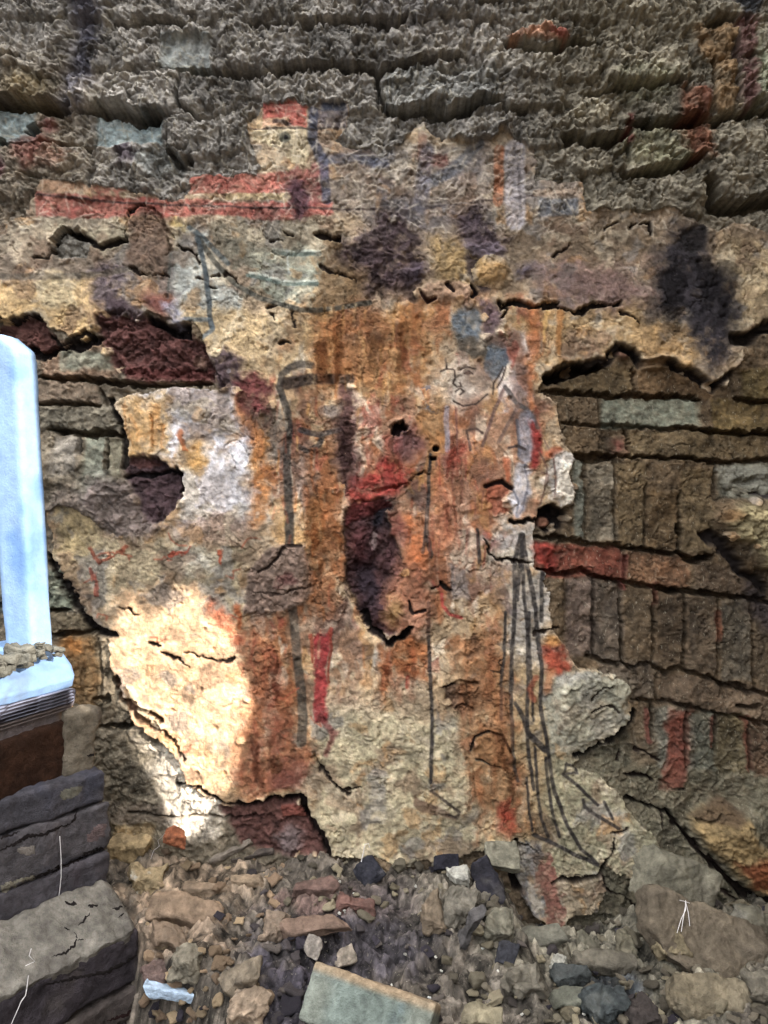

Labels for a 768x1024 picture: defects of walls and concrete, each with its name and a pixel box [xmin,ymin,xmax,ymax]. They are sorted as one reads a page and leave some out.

spalling [0,281,224,388]
leakage [312,205,435,315]
crack [496,298,641,325]
leakage [448,197,742,352]
spalling [541,341,736,395]
spalling [107,396,185,531]
spalling [534,459,580,534]
spalling [47,551,119,640]
spalling [343,499,410,639]
crack [146,640,236,668]
flaking render [553,665,638,760]
spalling [217,792,333,859]